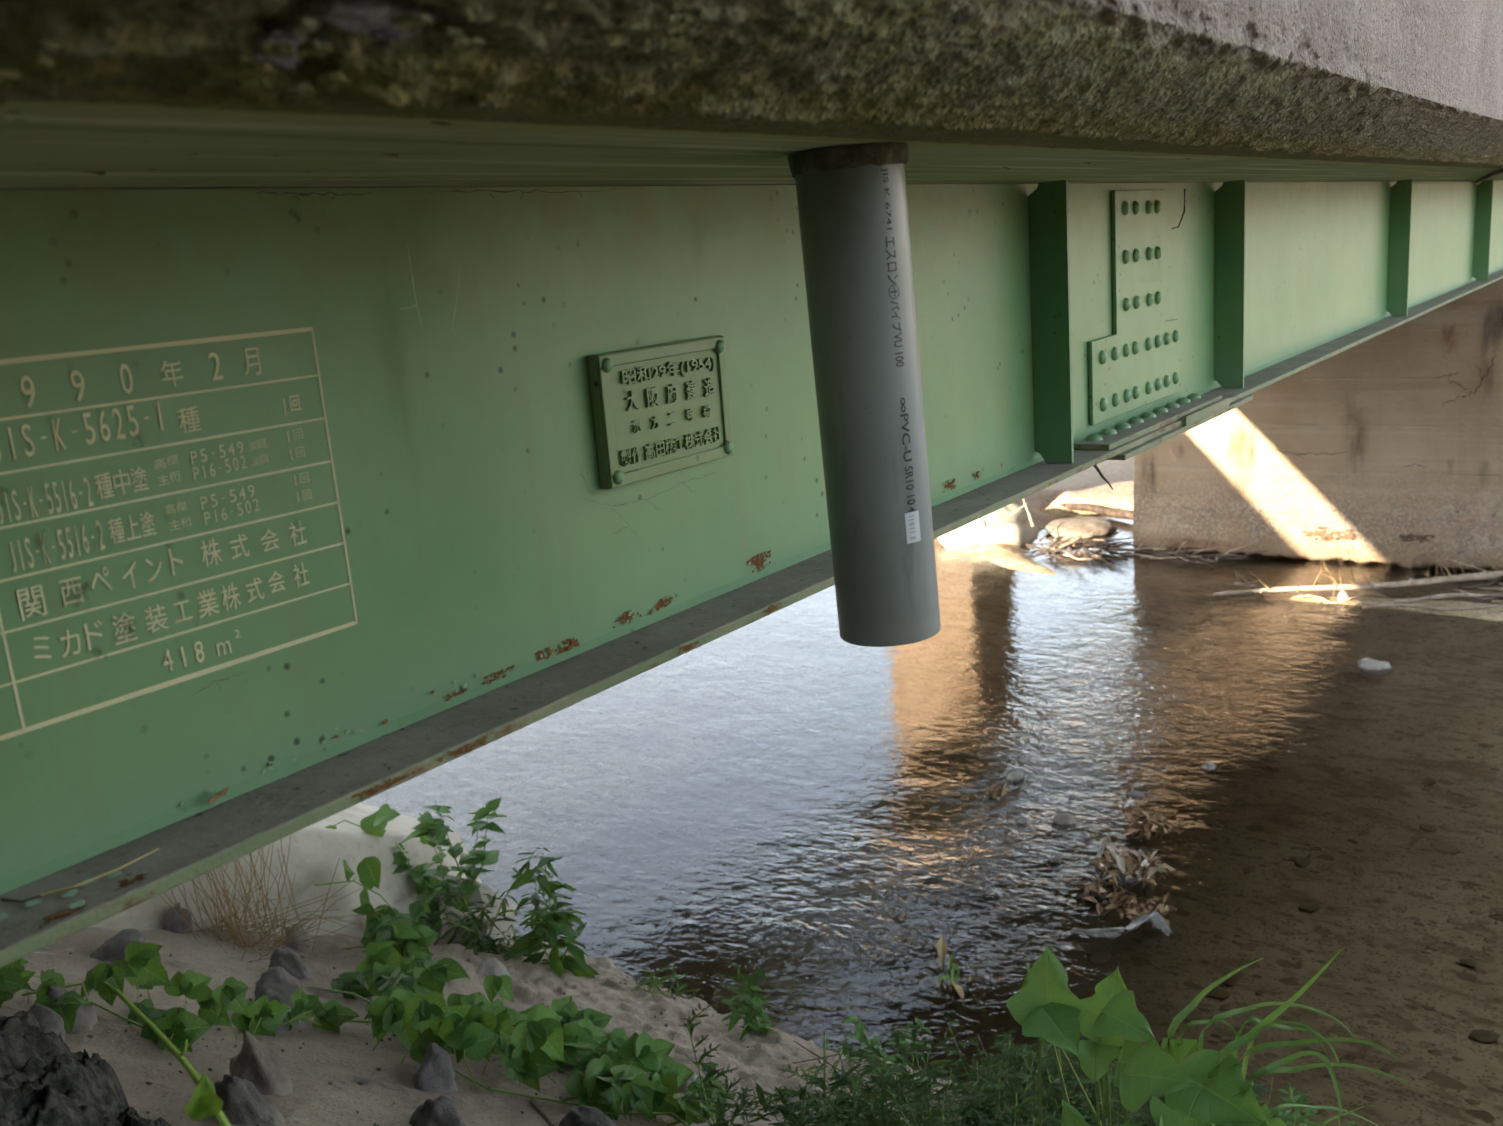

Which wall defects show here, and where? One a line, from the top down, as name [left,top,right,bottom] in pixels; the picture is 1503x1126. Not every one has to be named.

crack [1437,349,1497,406]
corrosion [746,550,771,573]
corrosion [613,596,673,628]
corrosion [535,637,580,661]
corrosion [442,665,515,701]